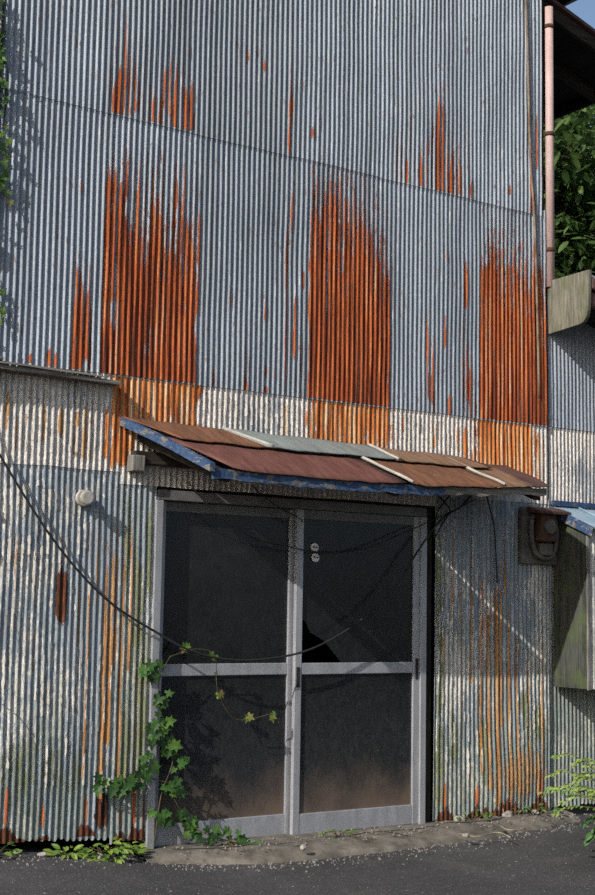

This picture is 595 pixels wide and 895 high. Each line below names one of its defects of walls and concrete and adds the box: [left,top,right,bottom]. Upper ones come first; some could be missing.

corrosion [109,16,195,130]
corrosion [396,96,472,198]
corrosion [70,130,214,468]
corrosion [264,168,404,449]
corrosion [457,228,547,481]
peeling [1,714,10,788]
peeling [0,480,90,614]
corrosion [55,558,68,625]
peeling [23,620,112,788]
corrosion [75,515,138,778]
corrosion [112,790,145,842]
corrosion [435,519,547,821]